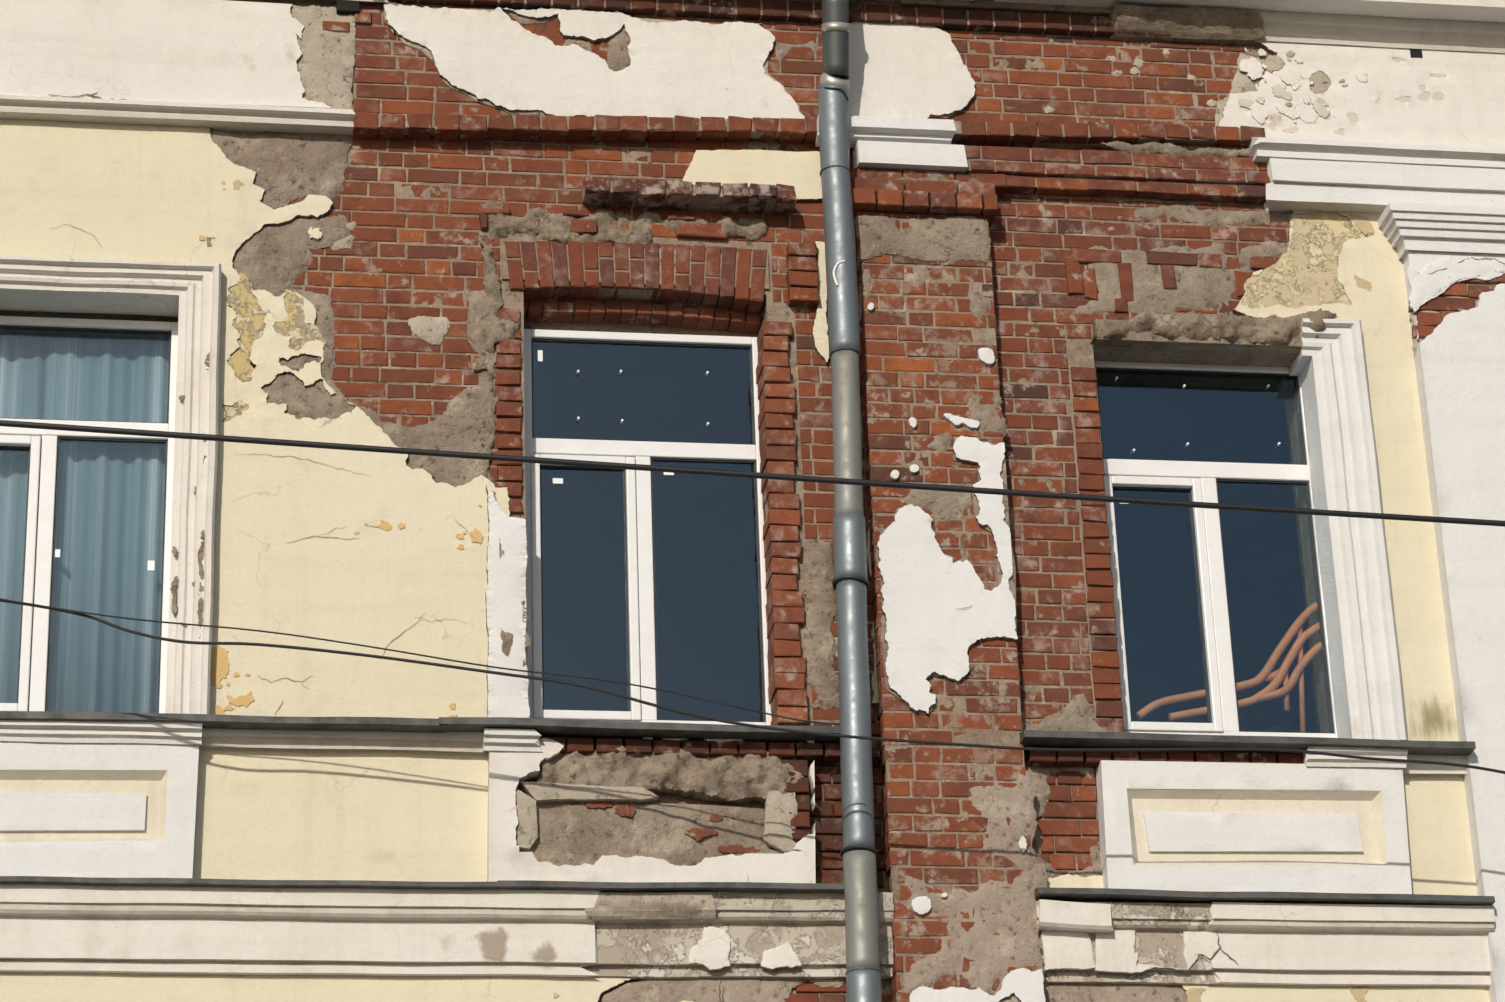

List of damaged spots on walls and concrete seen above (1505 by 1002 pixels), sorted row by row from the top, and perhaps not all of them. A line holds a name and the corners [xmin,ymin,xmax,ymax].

peeling [1375,73,1446,103]
spalling [1406,257,1505,351]
spalling [204,0,1375,1002]
peeling [170,530,255,715]
crack [384,612,459,653]
crack [1198,930,1238,964]